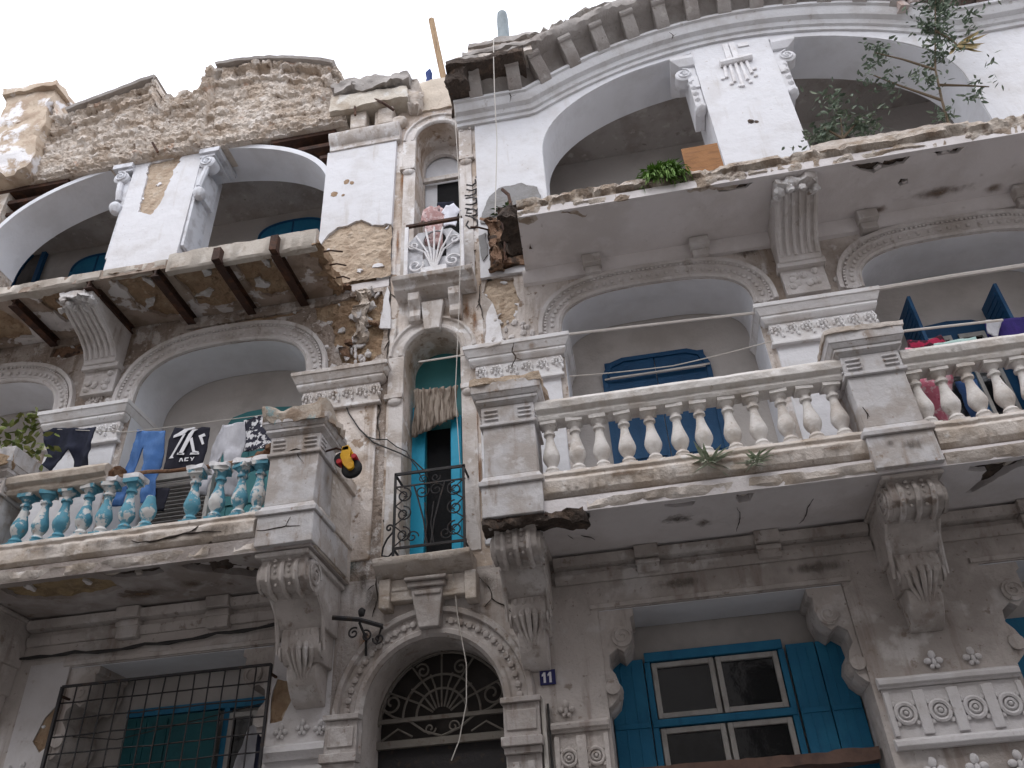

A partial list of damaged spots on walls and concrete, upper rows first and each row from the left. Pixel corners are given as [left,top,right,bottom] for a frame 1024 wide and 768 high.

flaking render [140,142,180,215]
spalling [855,157,906,170]
spalling [41,292,69,320]
spalling [107,270,179,315]
spalling [175,268,237,306]
spalling [237,259,291,294]
flaking render [310,222,392,364]
spalling [470,188,532,329]
crack [131,526,221,543]
spalling [481,506,591,540]